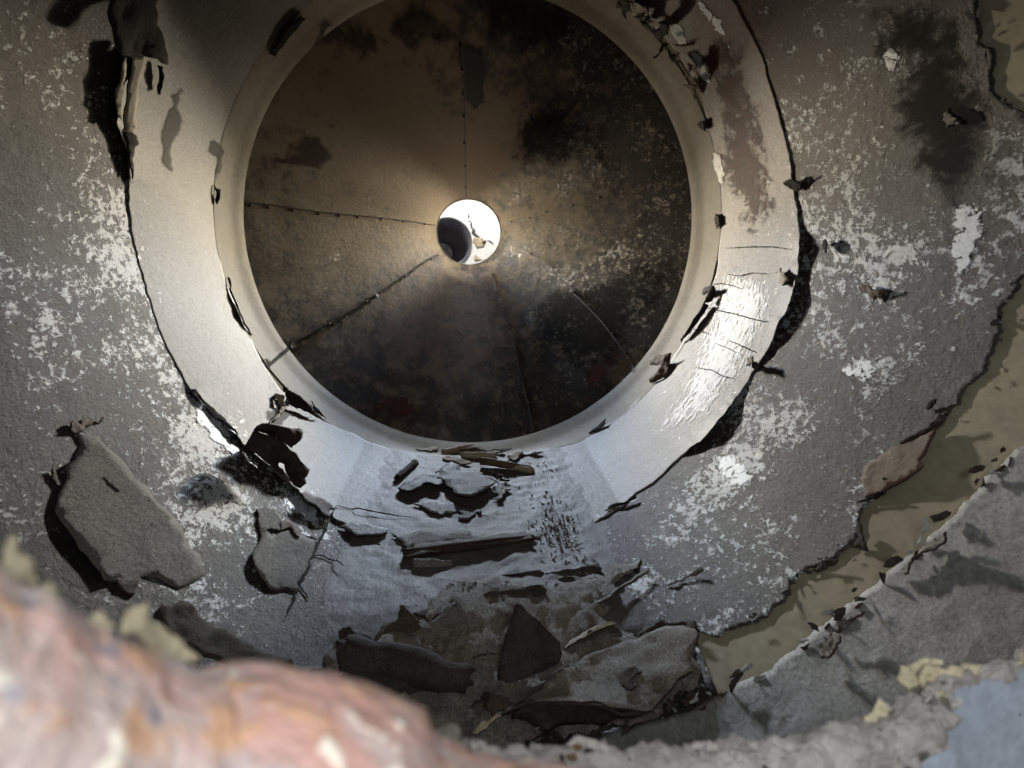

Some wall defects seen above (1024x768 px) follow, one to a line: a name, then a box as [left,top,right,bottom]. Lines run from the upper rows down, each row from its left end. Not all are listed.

peeling [107,0,168,179]
peeling [670,24,710,83]
water stain [882,48,900,71]
crack [693,246,785,354]
peeling [859,284,885,301]
peeling [51,417,295,668]
peeling [252,505,316,593]
peeling [244,387,334,518]
crack [285,505,409,617]
peeling [394,459,442,492]
peeling [432,446,1024,768]
peeling [777,399,949,596]